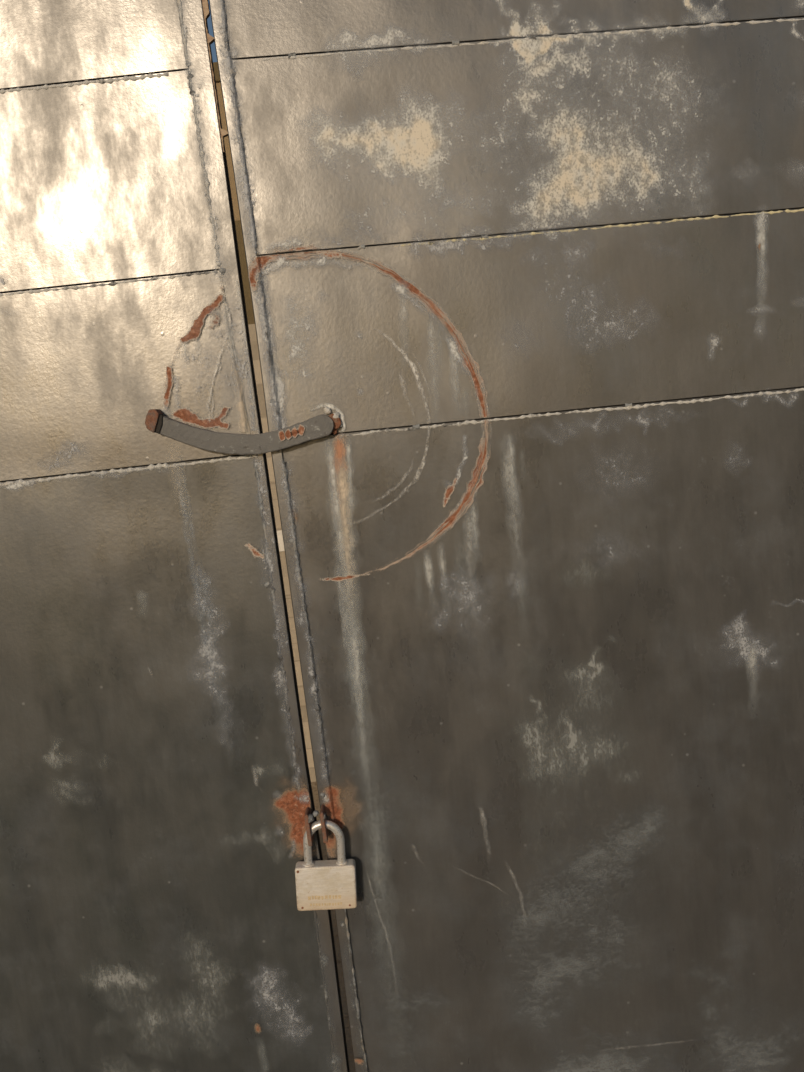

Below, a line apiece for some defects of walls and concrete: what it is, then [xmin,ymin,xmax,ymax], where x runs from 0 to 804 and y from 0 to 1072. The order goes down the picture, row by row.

leakage [684,0,725,30]
leakage [307,0,709,255]
leakage [756,212,768,251]
corrosion [245,239,491,581]
leakage [329,440,352,593]
leakage [195,570,226,699]
leakage [565,652,604,706]
leakage [722,616,778,666]
leakage [521,699,619,780]
corrosion [274,775,360,857]
leakage [95,966,155,994]
leakage [254,967,302,1037]